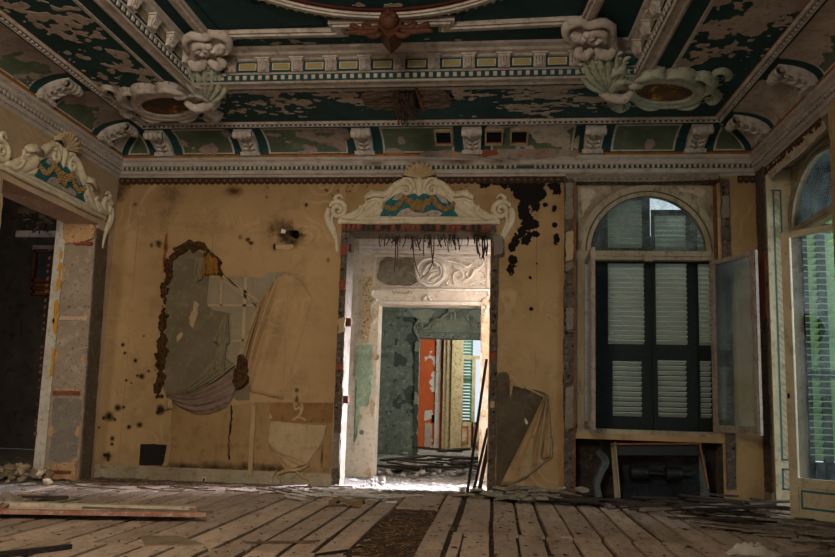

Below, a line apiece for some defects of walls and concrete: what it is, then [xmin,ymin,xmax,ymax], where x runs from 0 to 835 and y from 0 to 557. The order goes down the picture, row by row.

peeling [0,0,159,128]
peeling [677,0,809,68]
peeling [779,0,835,66]
peeling [221,92,364,118]
peeling [266,128,350,154]
peeling [420,88,607,160]
mould [479,176,562,276]
peeling [189,301,199,328]